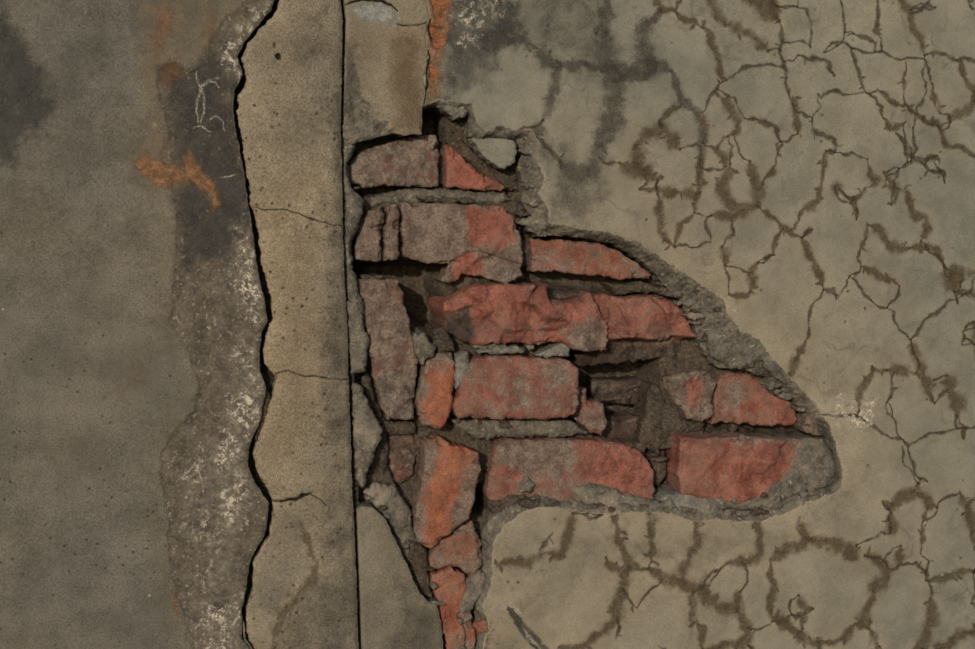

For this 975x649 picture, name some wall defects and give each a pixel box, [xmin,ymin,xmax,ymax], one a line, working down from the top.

damp [0,14,54,159]
corrosion [135,152,219,210]
peeling [157,0,274,649]
crack [233,0,347,649]
spalling [341,49,843,649]
crack [474,0,975,649]